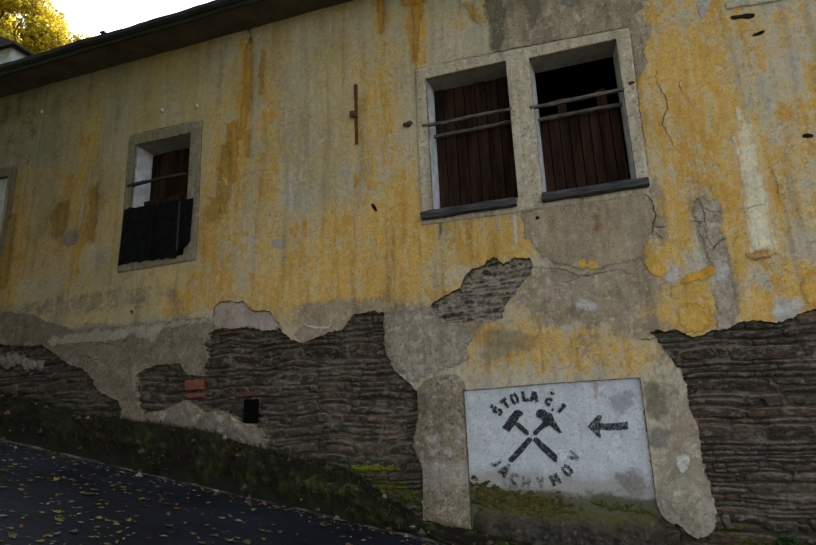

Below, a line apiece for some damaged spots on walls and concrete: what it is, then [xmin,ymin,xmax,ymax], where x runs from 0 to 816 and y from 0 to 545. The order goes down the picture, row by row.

crack [420,27,682,174]
flaking render [431,257,533,323]
crack [646,194,667,239]
crack [689,198,738,251]
flaking render [0,300,423,518]
flaking render [650,195,816,545]